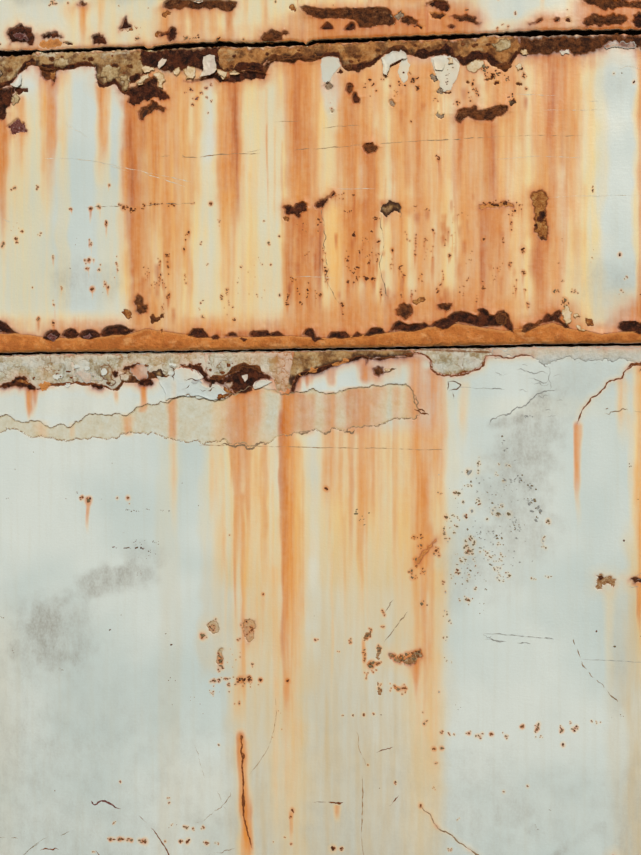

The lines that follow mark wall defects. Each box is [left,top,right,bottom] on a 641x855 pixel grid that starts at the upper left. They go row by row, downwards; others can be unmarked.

spalling [325,81,364,109]
spalling [342,50,366,70]
peeling [375,44,417,83]
peeling [430,49,528,97]
rust [0,0,641,342]
rust [0,351,173,427]
peeling [0,363,419,449]
crack [0,352,641,450]
rust [573,422,585,530]
rust [583,367,641,718]
rust [134,344,537,855]
crack [422,808,485,855]